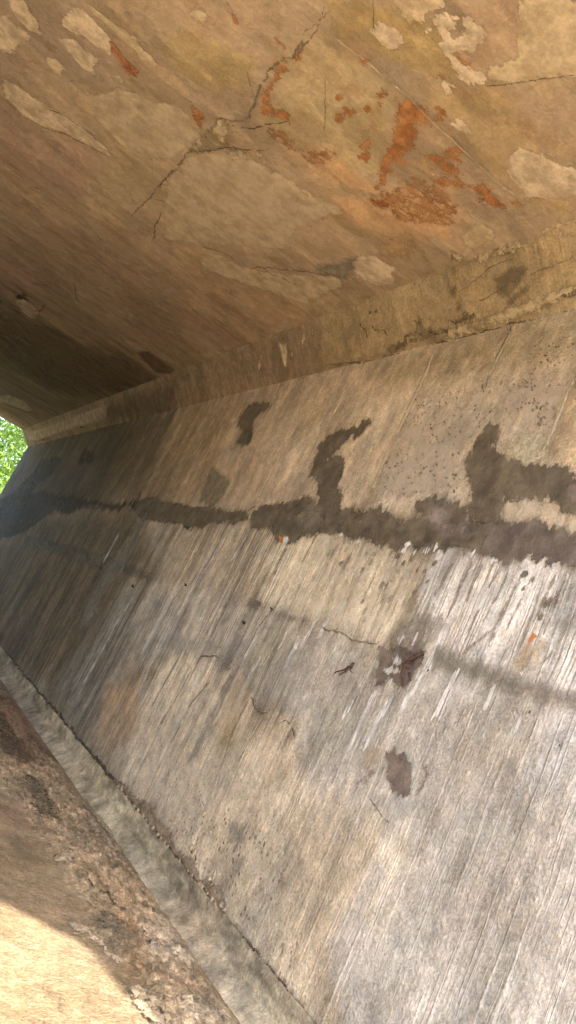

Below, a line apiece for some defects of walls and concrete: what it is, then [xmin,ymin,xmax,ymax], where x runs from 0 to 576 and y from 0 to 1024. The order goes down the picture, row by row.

peeling [0,0,42,54]
peeling [46,3,158,76]
rust [109,42,138,77]
peeling [1,79,396,307]
crack [130,7,331,241]
rust [260,36,336,167]
rust [335,88,520,225]
peeling [368,0,576,96]
peeling [507,147,576,200]
water stain [236,401,271,446]
water stain [0,418,576,756]
water stain [361,746,431,798]